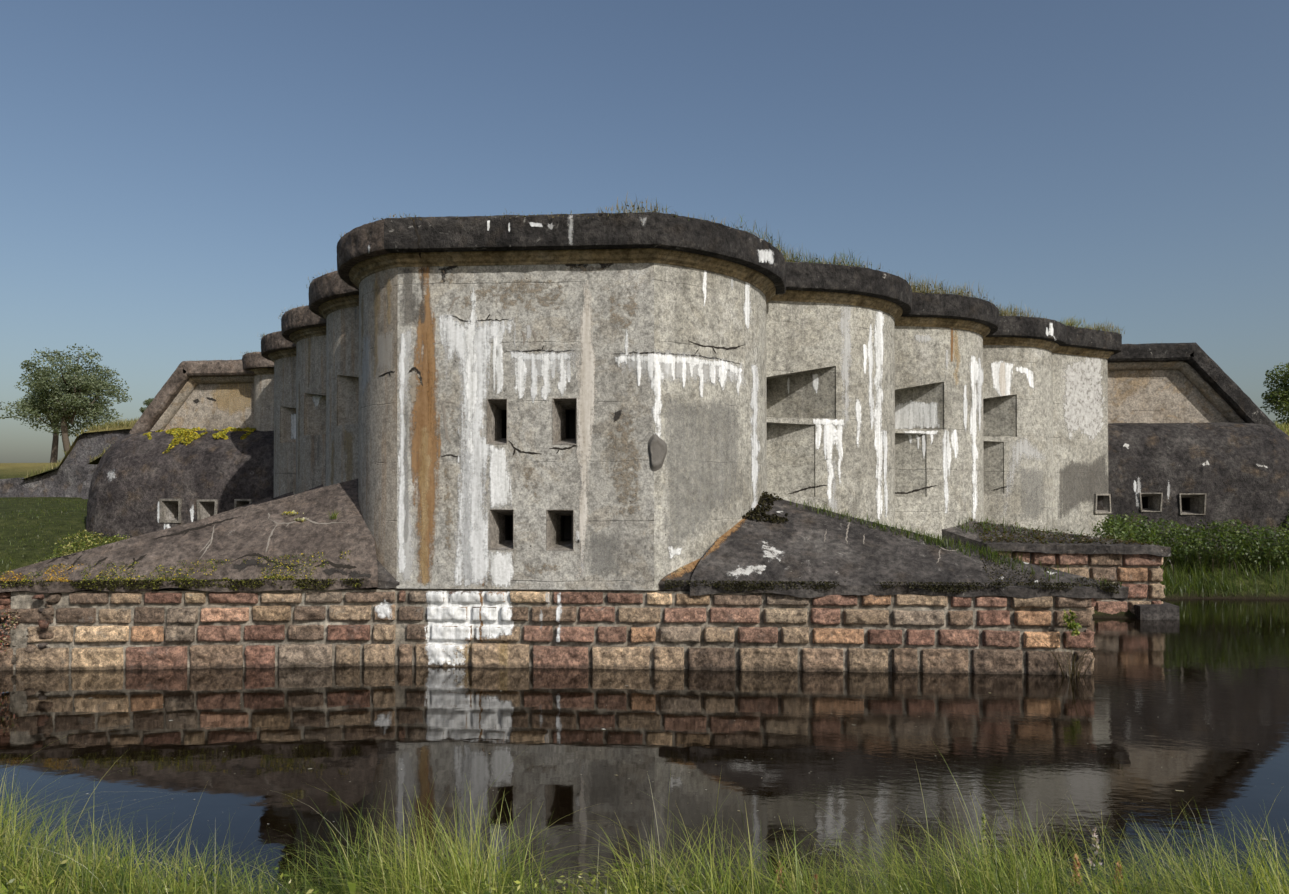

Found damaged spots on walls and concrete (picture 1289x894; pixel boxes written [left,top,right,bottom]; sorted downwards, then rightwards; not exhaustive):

water stain [731,280,752,328]
rust [410,266,441,583]
water stain [425,285,597,666]
crack [509,441,577,455]
water stain [615,331,761,510]
water stain [813,306,1034,519]